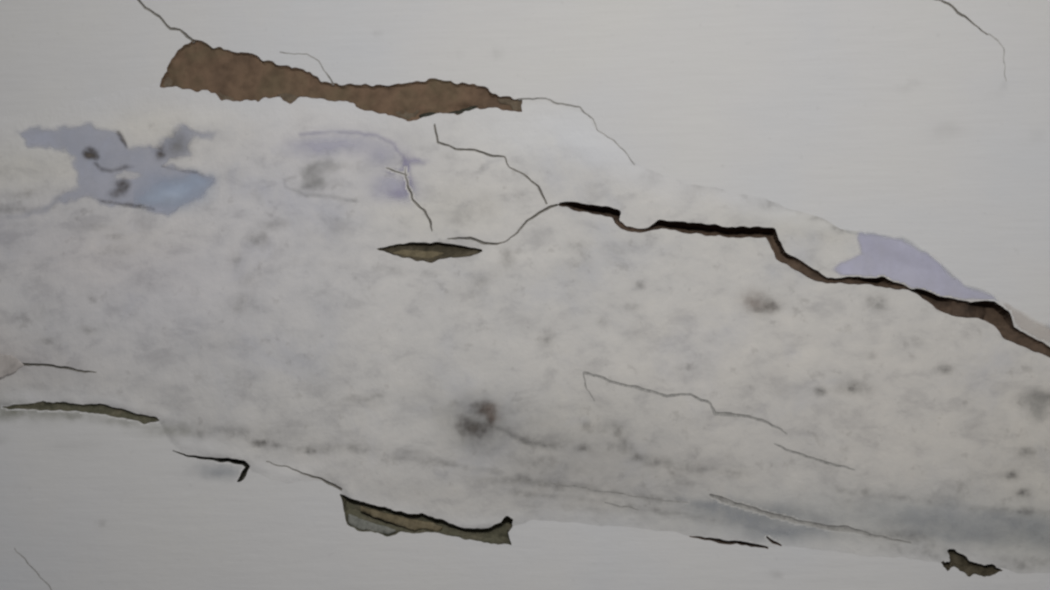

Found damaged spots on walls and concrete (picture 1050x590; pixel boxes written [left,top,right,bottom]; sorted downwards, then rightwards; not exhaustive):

crack [137,0,195,43]
spalling [160,40,522,122]
crack [936,0,1007,81]
peeling [22,125,213,214]
spalling [377,242,482,263]
crack [386,124,1050,358]
peeling [836,234,993,299]
crack [0,354,97,379]
crack [3,401,159,424]
crack [583,371,855,470]
spalling [266,461,513,545]
spalling [941,549,1003,577]